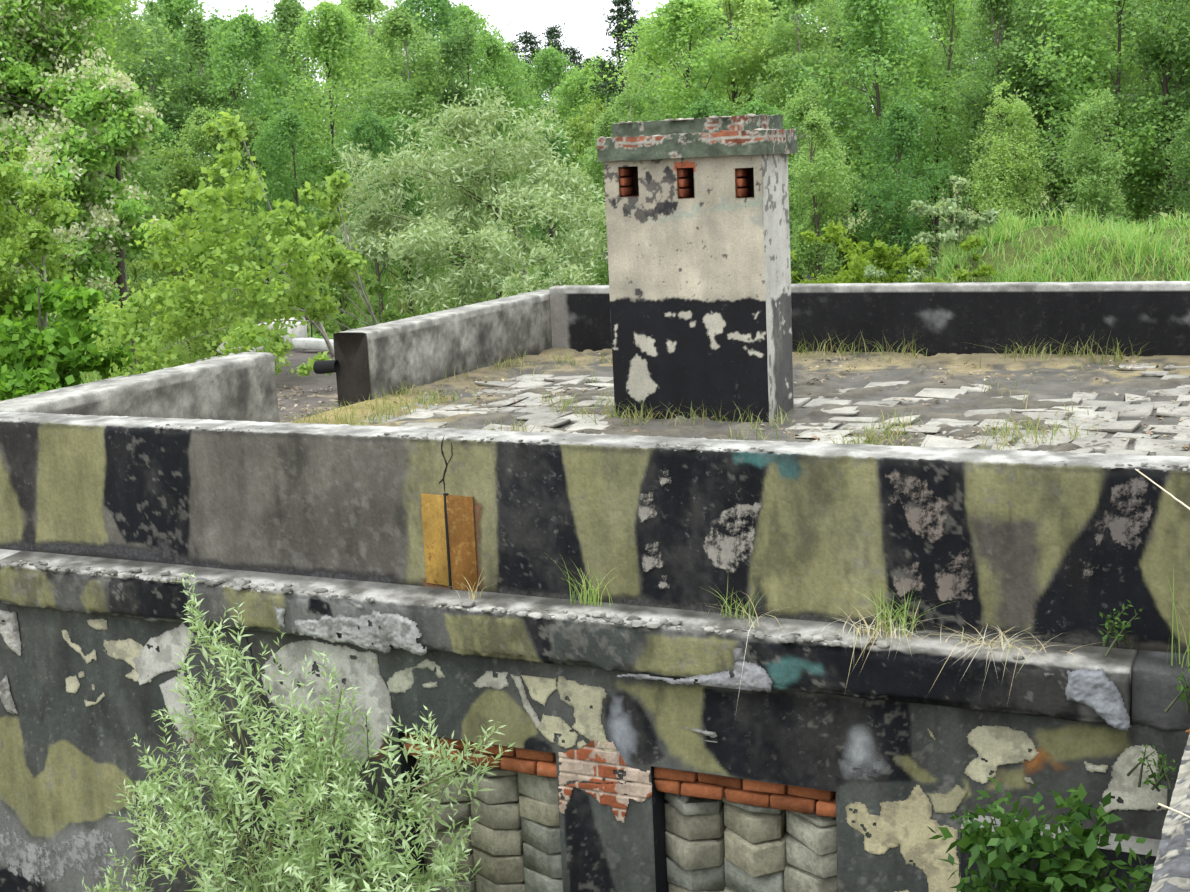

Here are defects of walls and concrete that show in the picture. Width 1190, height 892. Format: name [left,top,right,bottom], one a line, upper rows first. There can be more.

peeling [638,493,657,522]
peeling [642,542,663,572]
peeling [703,502,762,573]
spalling [422,598,686,631]
flaking render [0,560,445,765]
spalling [617,626,891,693]
spalling [473,670,652,823]
flaking render [680,727,717,743]
flaking render [845,725,1039,892]
peeling [0,805,117,885]